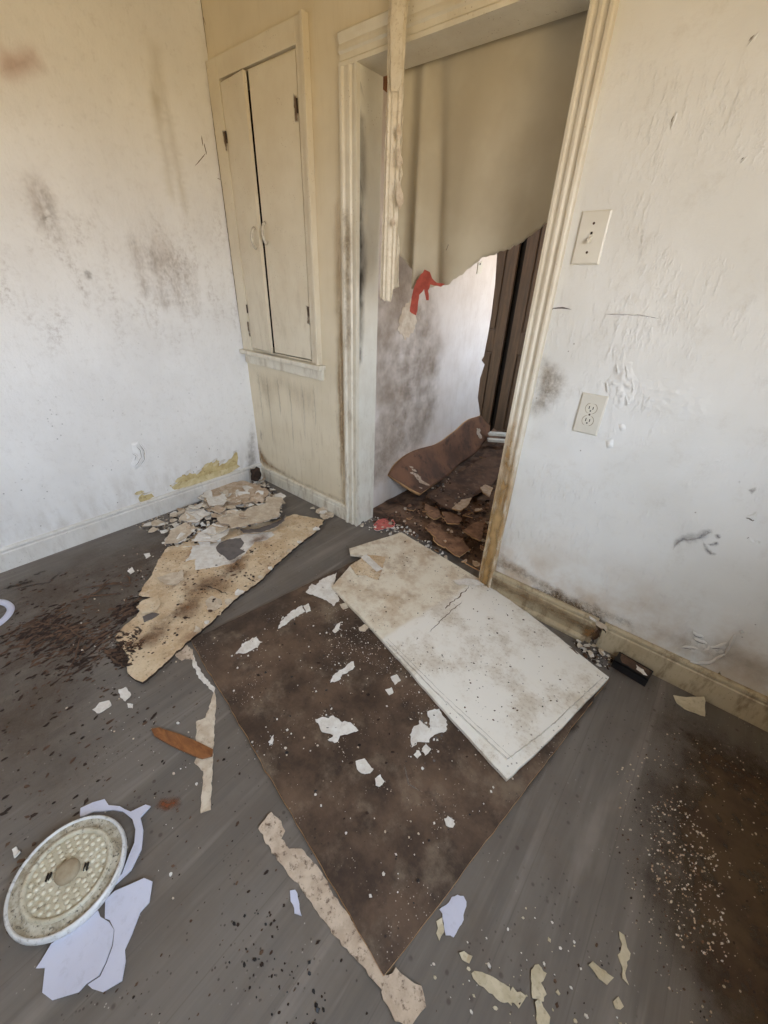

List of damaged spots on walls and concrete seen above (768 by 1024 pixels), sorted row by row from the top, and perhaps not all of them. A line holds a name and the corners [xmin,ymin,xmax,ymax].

peeling [169,450,240,490]
peeling [135,490,154,502]
damp [537,589,605,630]